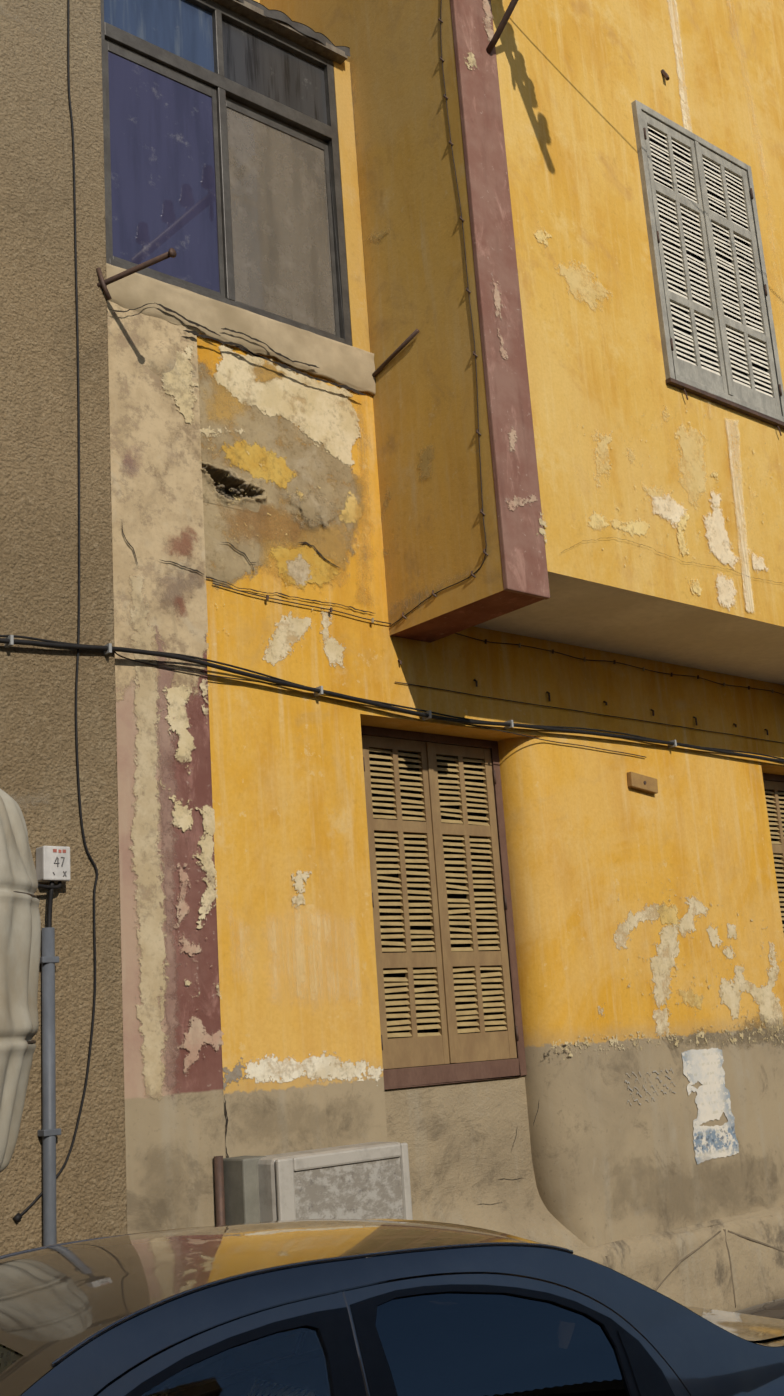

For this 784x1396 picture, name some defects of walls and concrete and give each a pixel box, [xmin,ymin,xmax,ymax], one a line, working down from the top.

peeling [464,52,478,70]
peeling [482,0,494,41]
peeling [557,260,613,310]
peeling [583,410,772,611]
crack [122,525,373,613]
peeling [107,300,364,1099]
peeling [551,879,784,1057]